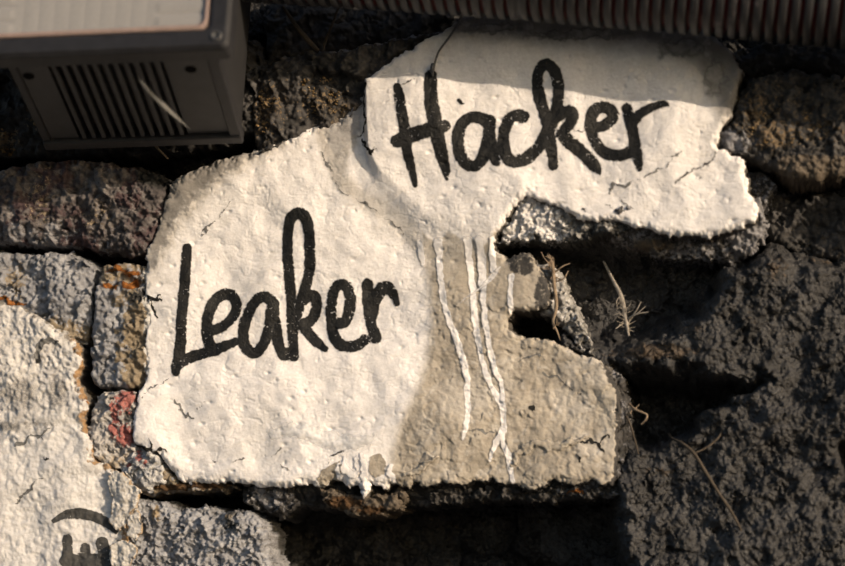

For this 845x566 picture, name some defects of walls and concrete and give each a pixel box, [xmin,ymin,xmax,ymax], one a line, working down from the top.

crack [606,151,716,209]
spalling [497,197,632,252]
spalling [317,452,413,499]
damp [489,426,515,484]
peeling [107,469,143,566]